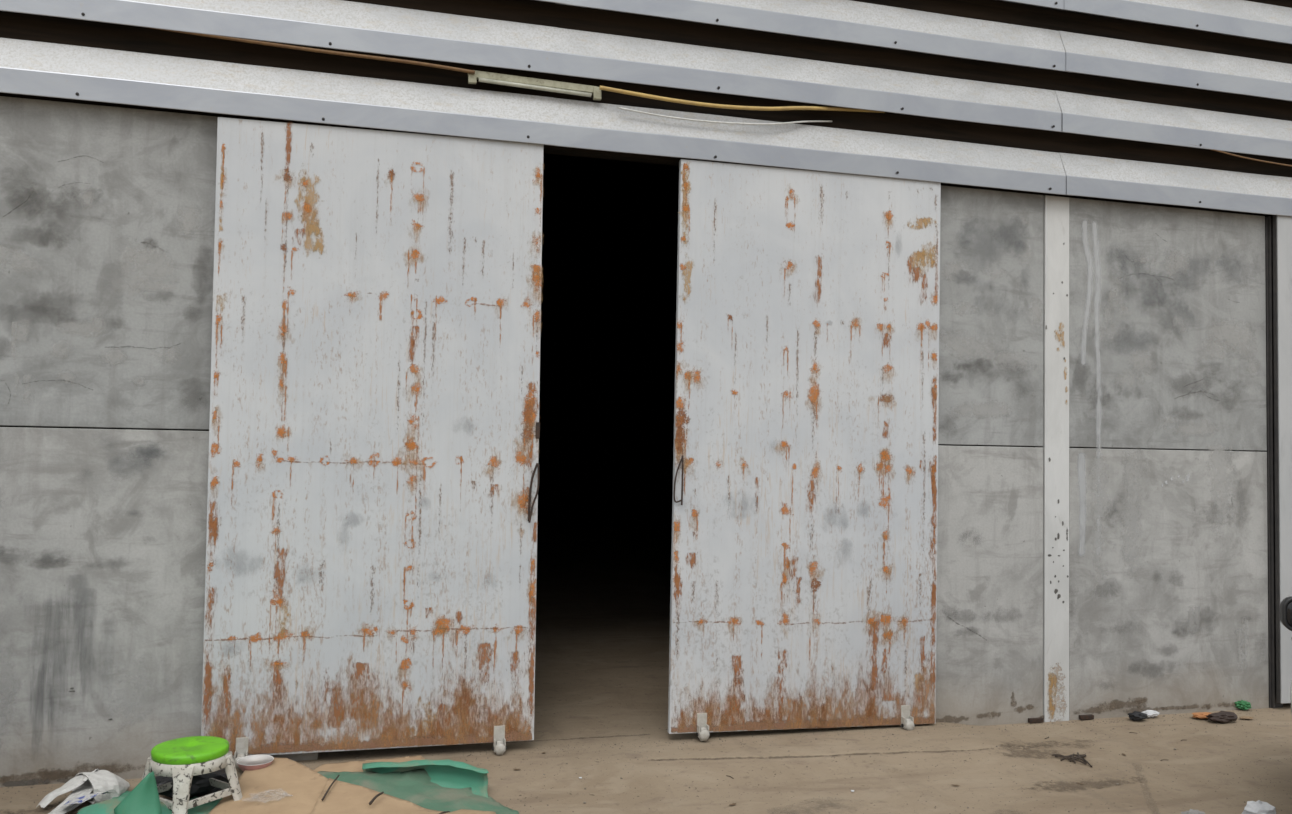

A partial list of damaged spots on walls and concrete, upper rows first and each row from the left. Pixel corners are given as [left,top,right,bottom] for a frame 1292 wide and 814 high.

corrosion [265,123,324,270]
corrosion [411,162,425,230]
corrosion [679,163,691,243]
corrosion [679,261,692,300]
corrosion [877,211,893,404]
corrosion [908,238,938,302]
corrosion [515,264,542,547]
damp [1078,221,1101,555]
corrosion [203,287,536,755]
corrosion [671,320,938,733]
corrosion [1048,675,1057,717]